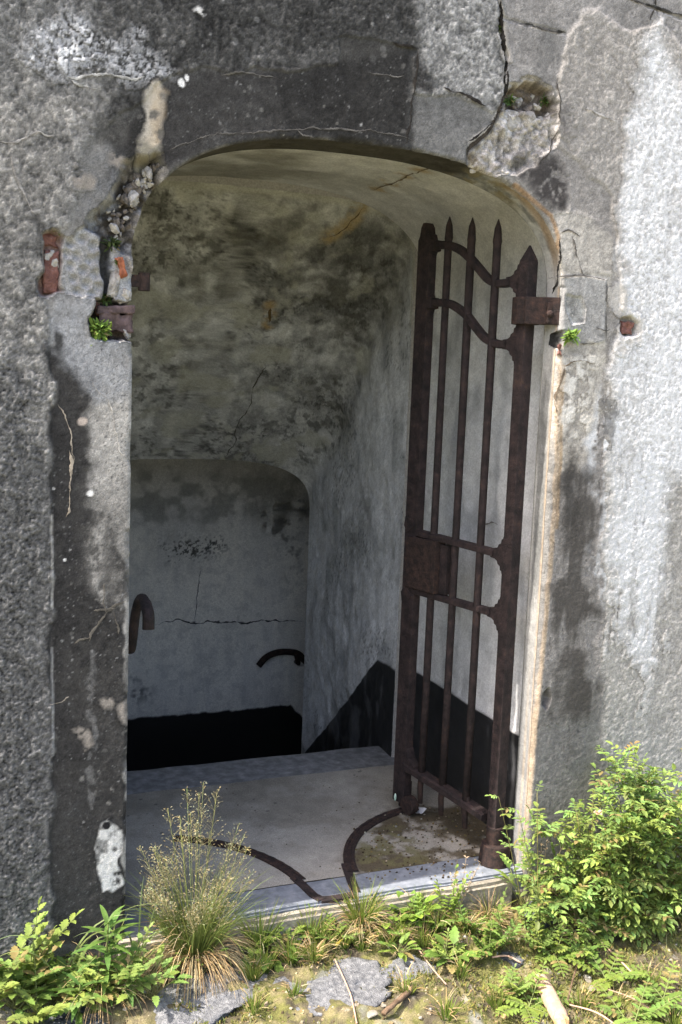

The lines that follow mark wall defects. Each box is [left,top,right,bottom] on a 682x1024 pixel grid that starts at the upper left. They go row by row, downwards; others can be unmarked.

crack [444,0,566,162]
spalling [466,74,561,178]
spalling [36,151,169,344]
damp [136,204,313,270]
damp [304,257,395,361]
crack [226,367,266,456]
damp [540,10,682,769]
crack [156,571,302,626]
peeling [93,819,126,894]